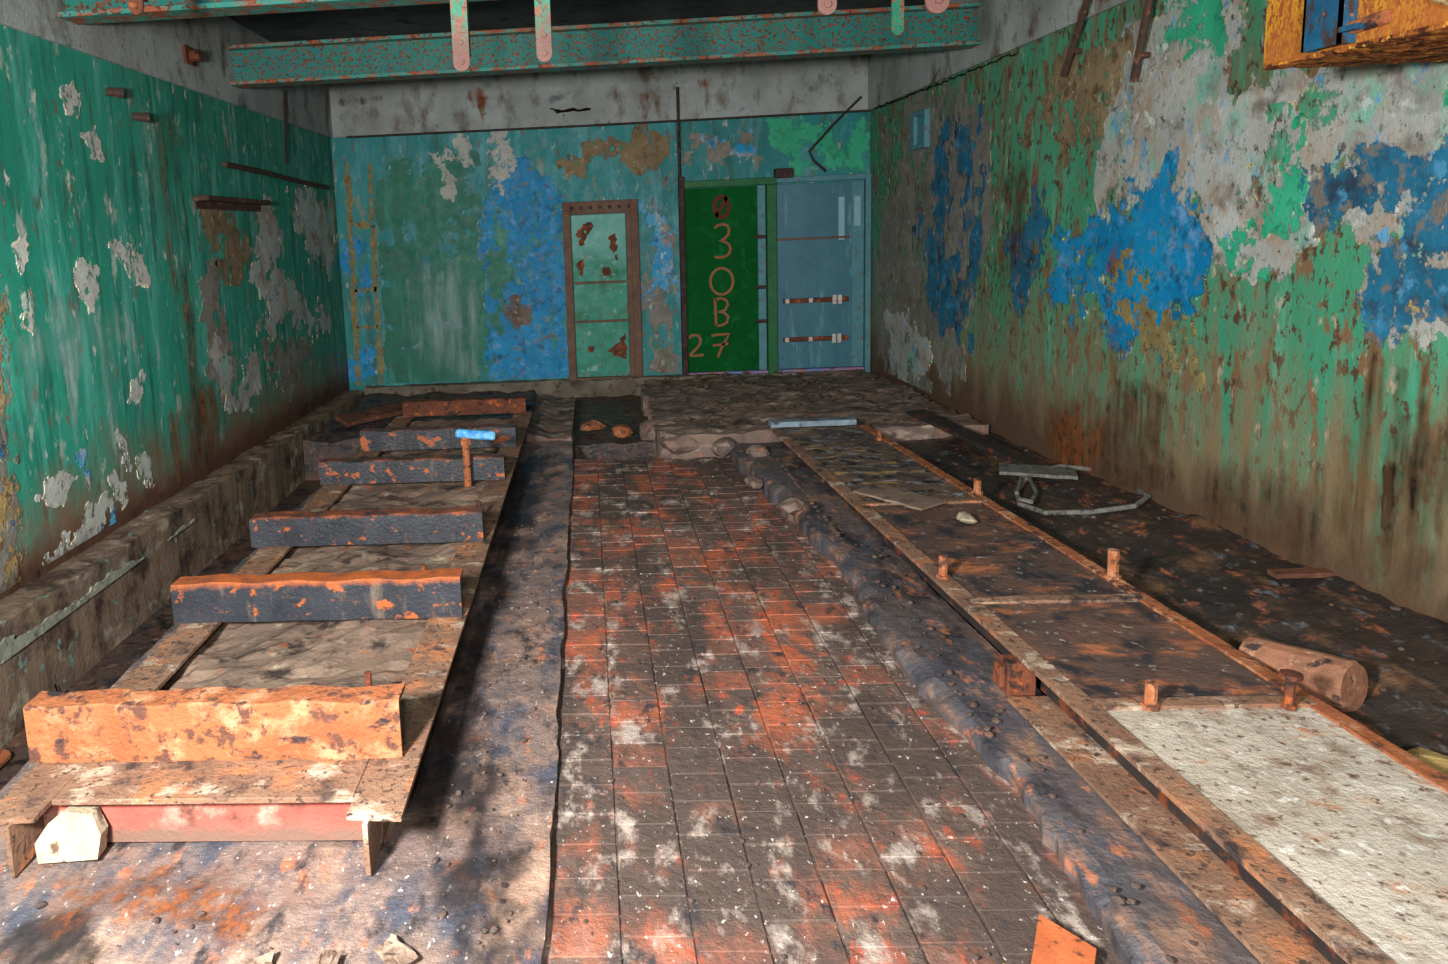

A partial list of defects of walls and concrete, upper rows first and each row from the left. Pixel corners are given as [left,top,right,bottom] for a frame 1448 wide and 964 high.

peeling [0,230,155,593]
peeling [59,82,105,162]
peeling [198,179,383,414]
peeling [429,131,517,336]
peeling [556,124,763,374]
peeling [1109,248,1206,392]
peeling [1018,0,1448,352]